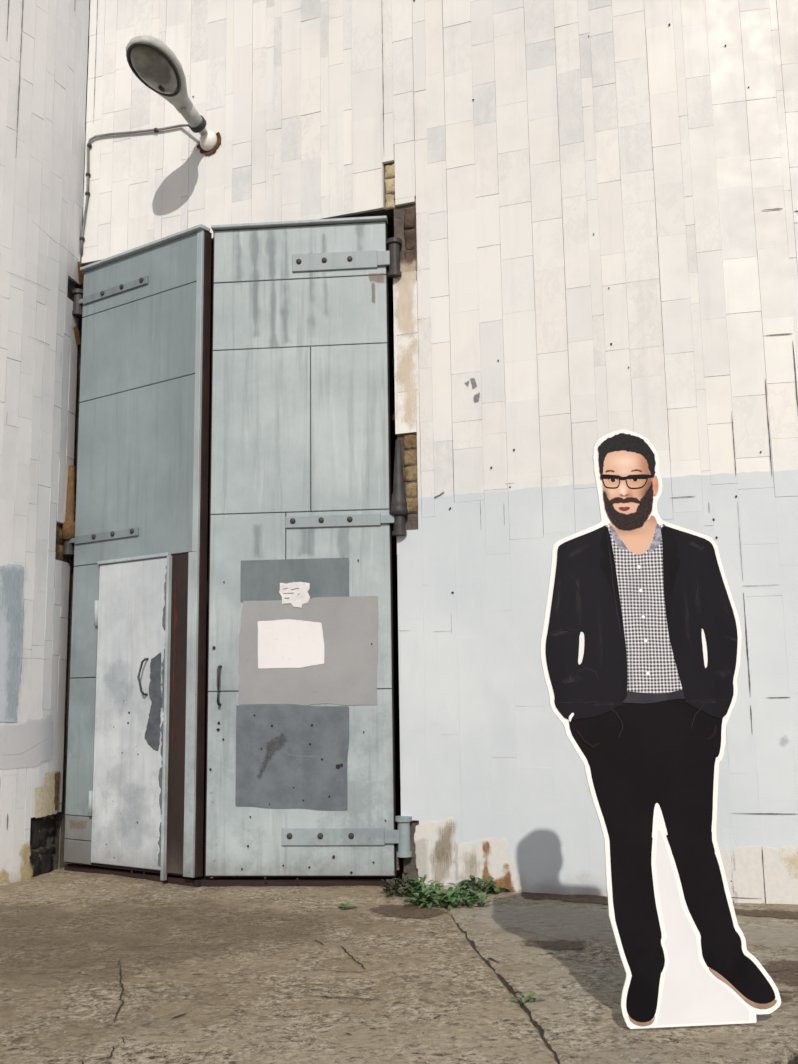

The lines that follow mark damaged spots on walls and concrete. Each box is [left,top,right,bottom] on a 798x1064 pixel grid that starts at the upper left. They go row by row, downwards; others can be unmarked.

spalling [385,163,416,268]
spalling [403,434,418,514]
spalling [29,771,59,877]
leakage [432,824,453,881]
corrosion [482,842,514,893]
crack [82,943,171,1064]
crack [451,915,560,1064]